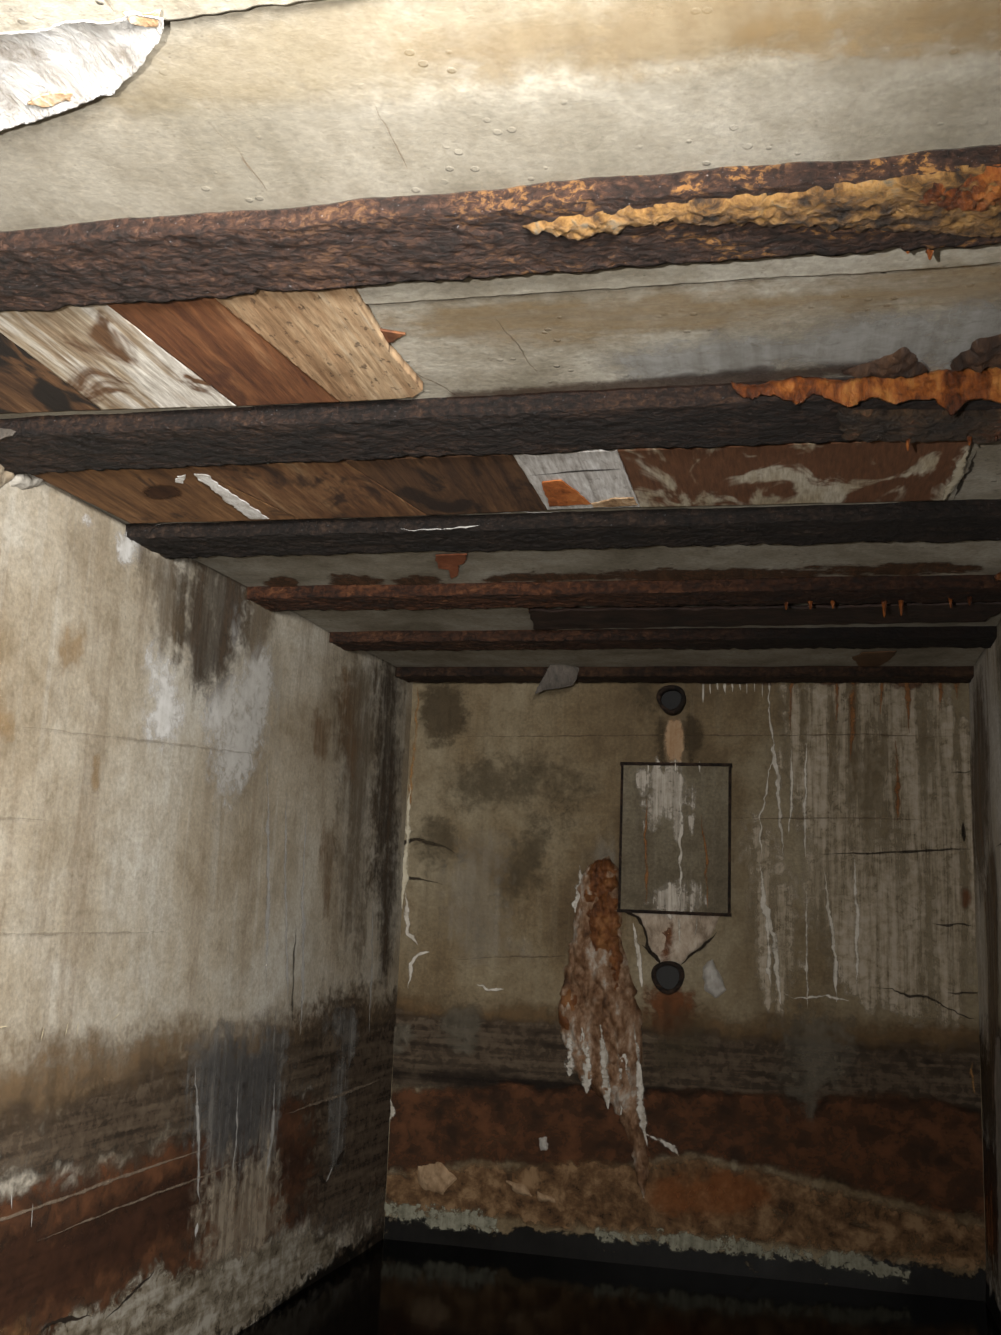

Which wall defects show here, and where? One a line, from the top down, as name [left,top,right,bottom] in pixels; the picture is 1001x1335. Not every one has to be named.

peeling [0,9,164,131]
spalling [0,464,47,490]
corrosion [263,576,299,587]
corrosion [329,553,467,586]
corrosion [482,562,982,583]
water stain [117,533,272,803]
water stain [0,659,1001,1335]
corrosion [558,856,679,1198]